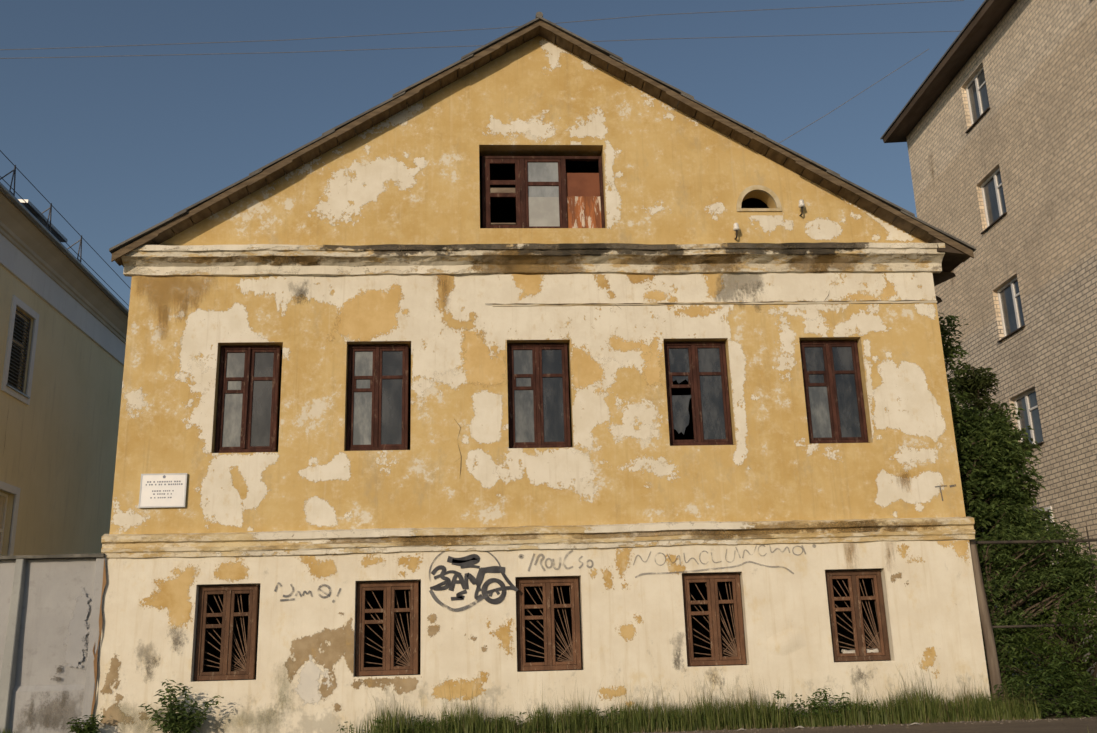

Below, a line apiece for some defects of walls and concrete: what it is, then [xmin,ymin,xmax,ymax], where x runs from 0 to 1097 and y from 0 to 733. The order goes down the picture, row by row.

peeling [270,102,426,227]
peeling [482,107,623,230]
water stain [189,256,318,266]
water stain [366,244,458,256]
water stain [473,243,613,275]
rust [567,196,602,228]
water stain [623,254,741,273]
peeling [748,198,926,259]
peeling [136,244,947,590]
peeling [139,564,200,629]
flaking render [283,612,419,712]
flaking render [430,671,489,702]